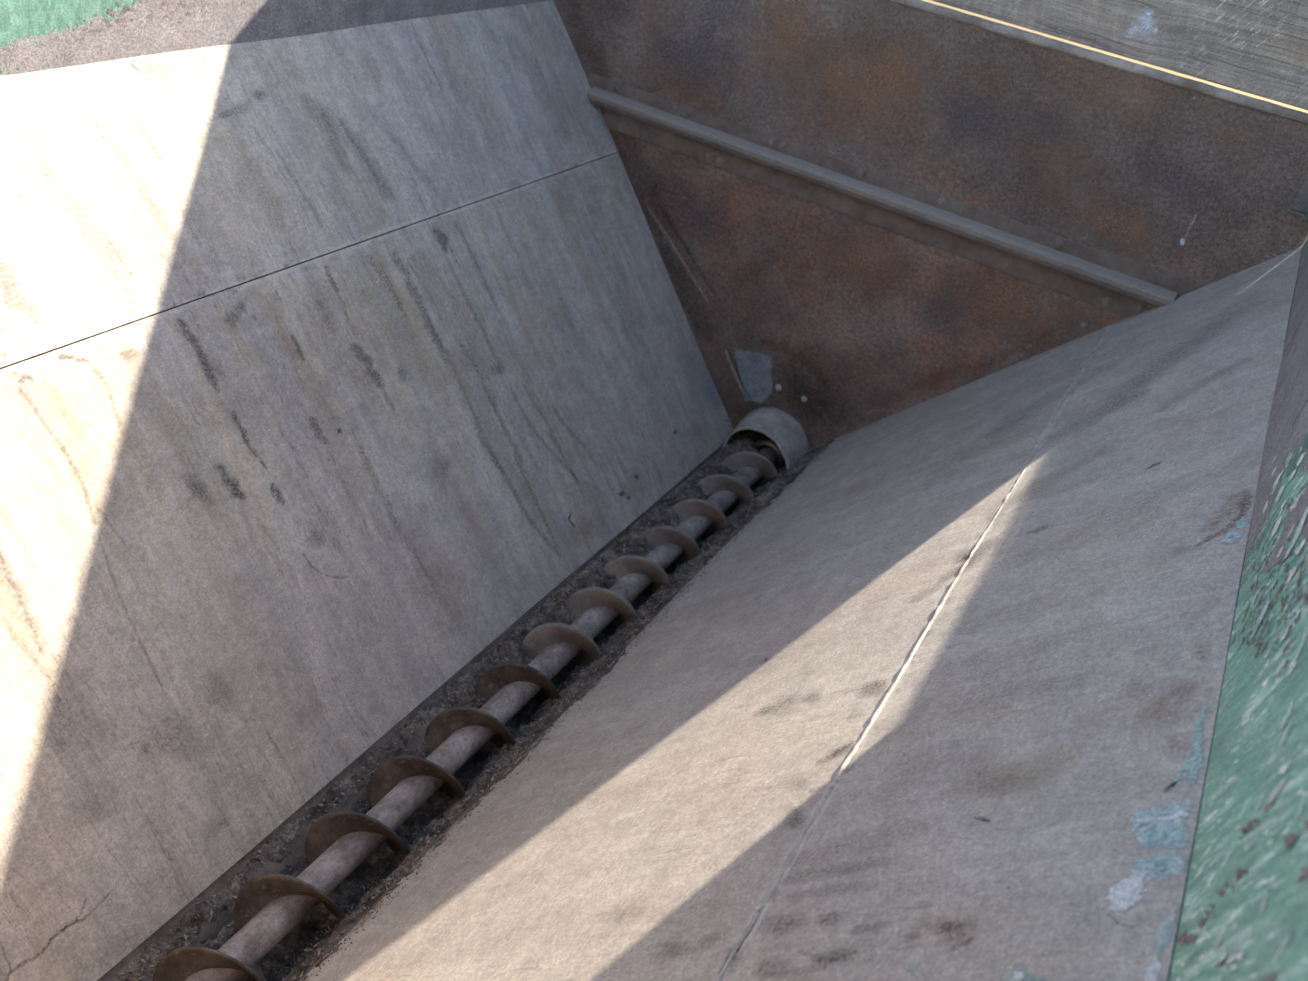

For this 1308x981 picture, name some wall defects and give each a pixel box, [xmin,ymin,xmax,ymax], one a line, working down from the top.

peeling [0,0,550,76]
damp [180,320,219,391]
peeling [1101,699,1208,927]
peeling [1238,764,1288,840]
peeling [1143,868,1248,981]